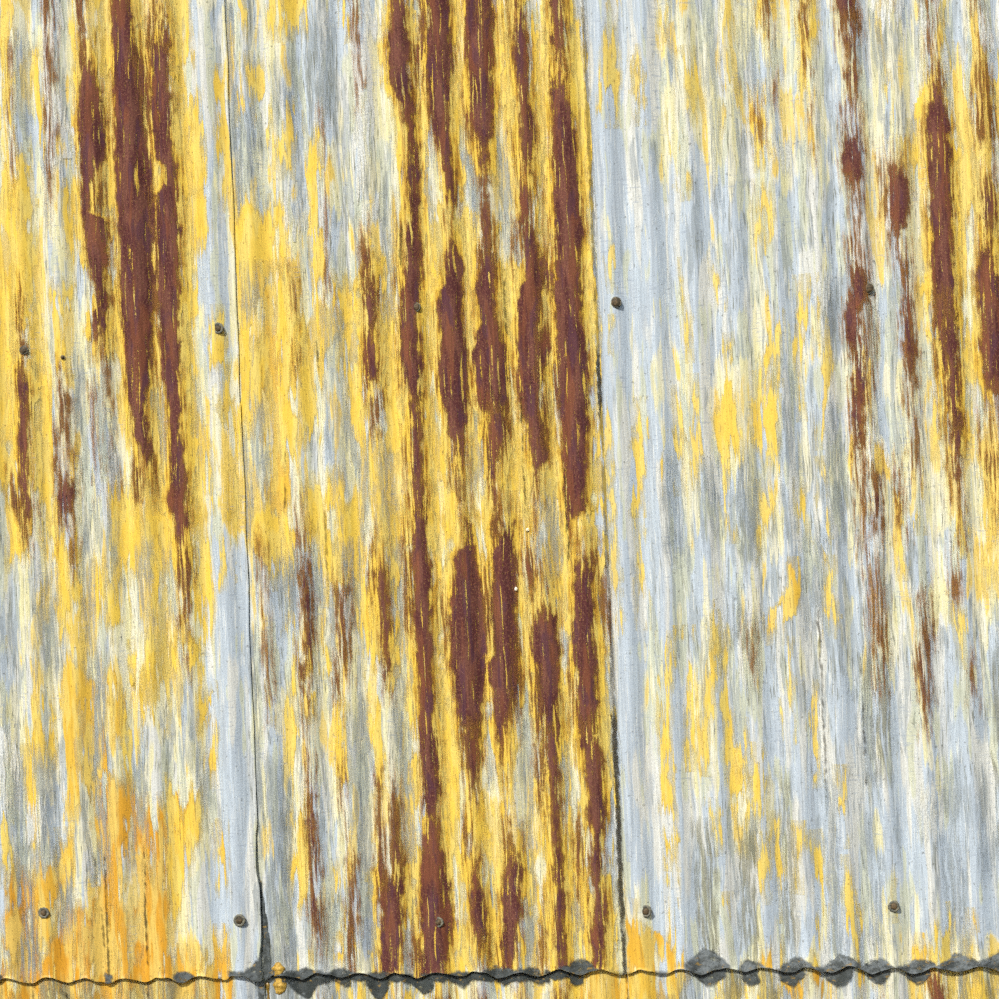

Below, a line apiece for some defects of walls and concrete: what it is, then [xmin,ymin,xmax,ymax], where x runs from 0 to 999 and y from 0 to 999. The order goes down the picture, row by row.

corrosion [8,310,77,543]
corrosion [70,0,199,626]
peeling [0,0,410,999]
corrosion [344,0,618,978]
peeling [515,0,649,624]
peeling [714,319,781,539]
corrosion [833,0,862,106]
corrosion [841,125,901,549]
corrosion [878,23,999,500]
peeling [922,0,999,390]
peeling [553,909,689,999]
peeling [657,603,767,887]